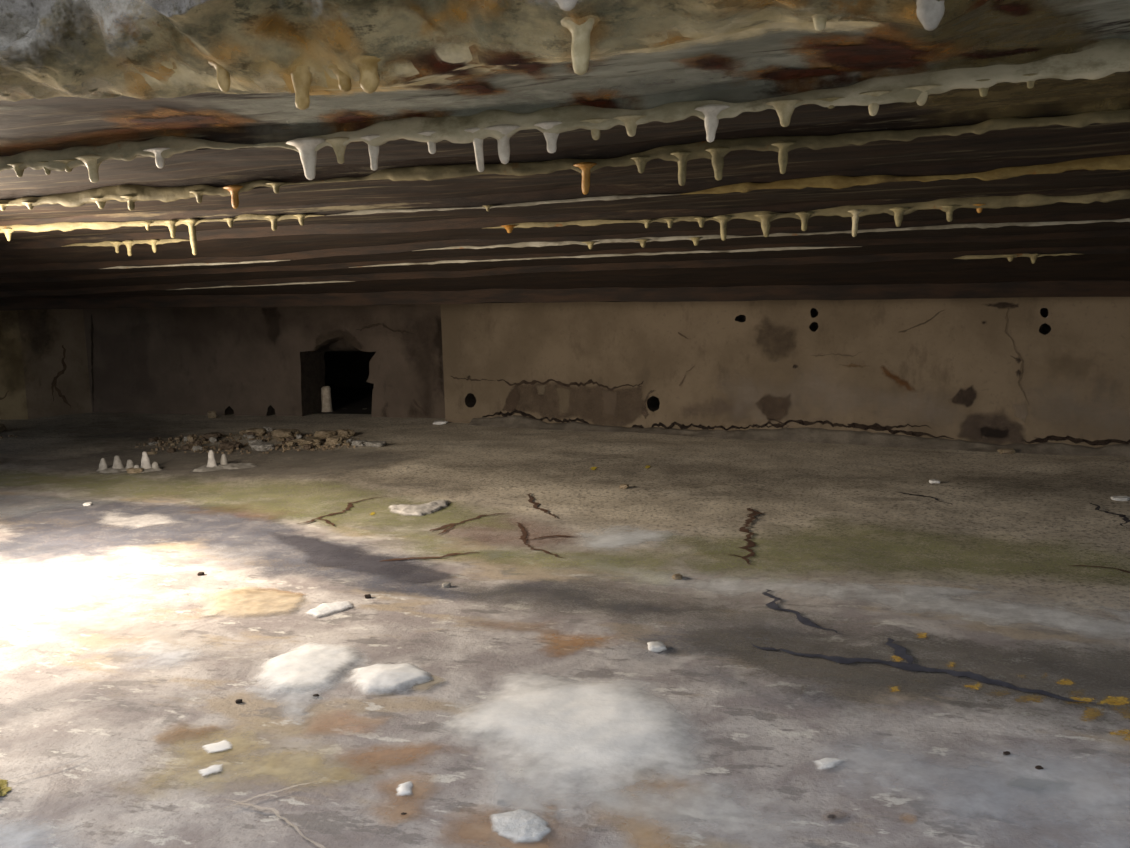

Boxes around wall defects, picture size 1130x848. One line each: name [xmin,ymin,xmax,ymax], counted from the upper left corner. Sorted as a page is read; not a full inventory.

corrosion [398,43,550,95]
corrosion [681,25,1041,93]
corrosion [112,110,250,137]
corrosion [322,112,375,132]
leakage [0,38,1130,172]
leakage [0,155,1130,247]
leakage [171,190,1130,290]
crack [631,419,953,439]
crack [379,493,576,562]
crack [729,507,762,565]
leakage [0,496,1130,724]
crack [751,589,1096,704]